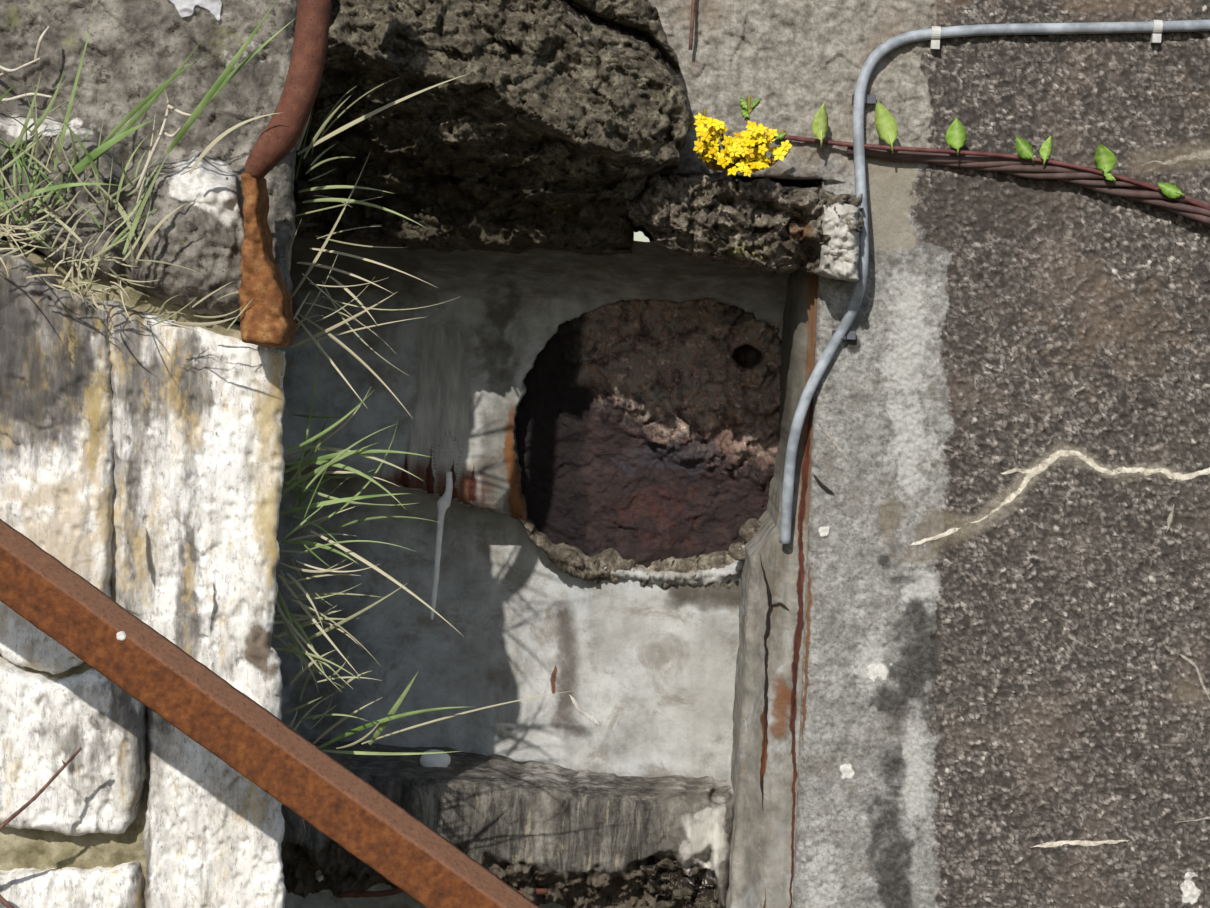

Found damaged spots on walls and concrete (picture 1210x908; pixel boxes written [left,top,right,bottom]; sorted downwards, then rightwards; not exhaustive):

crack [1141,150,1210,166]
corrosion [393,446,484,510]
corrosion [504,425,525,521]
crack [909,444,1210,546]
crack [760,555,790,811]
corrosion [771,400,812,908]
damp [874,599,939,721]
damp [867,755,914,908]